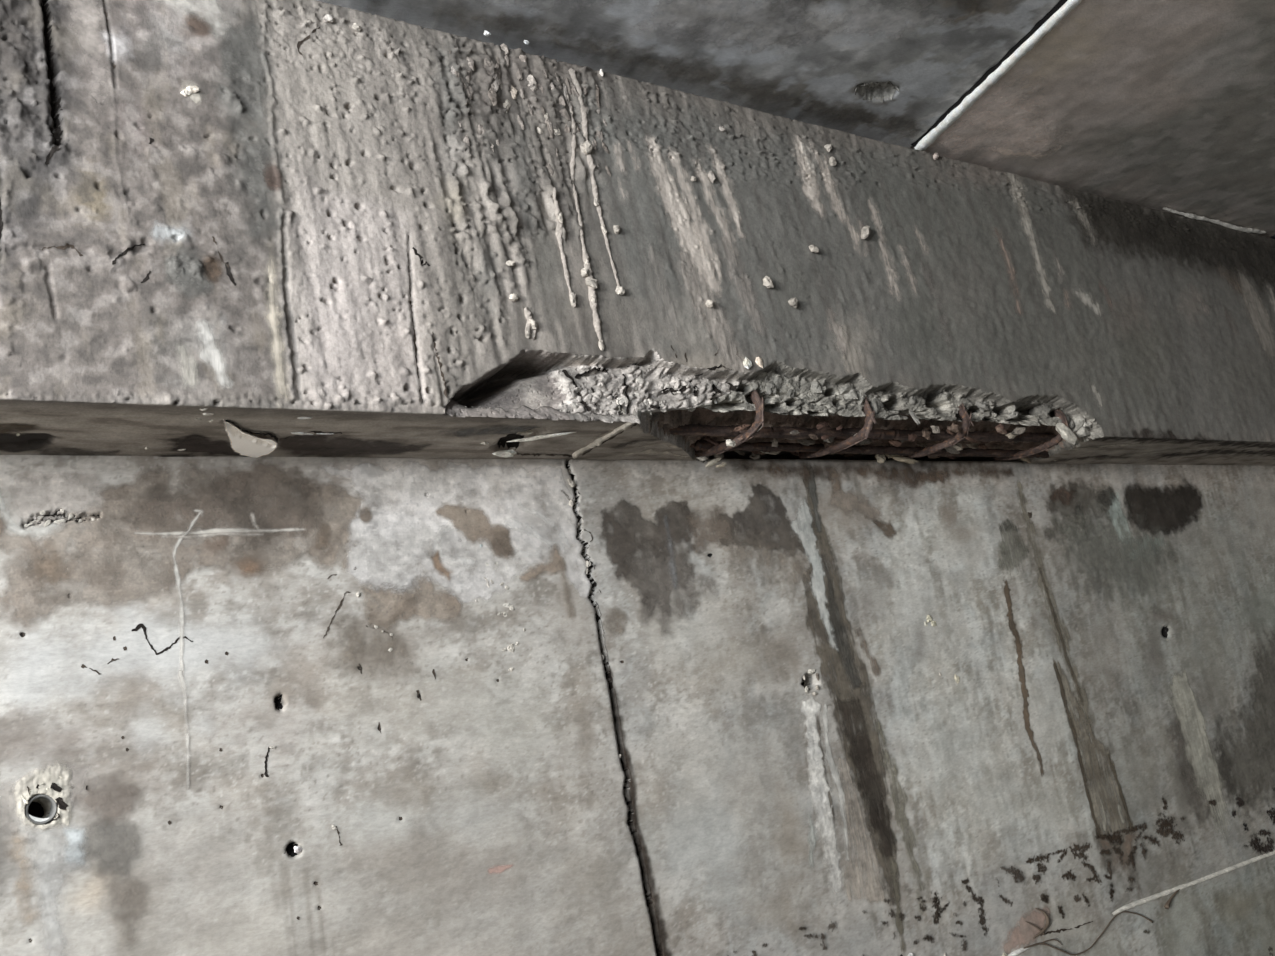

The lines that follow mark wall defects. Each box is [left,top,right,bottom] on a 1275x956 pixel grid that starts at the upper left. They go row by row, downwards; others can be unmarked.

efflorescence [614,137,761,372]
efflorescence [795,136,936,296]
spalling [0,763,89,833]
hole [22,508,100,528]
leakage [0,434,591,662]
crack [516,423,663,956]
leakage [601,466,989,951]
spalling [443,349,1275,468]
corrosion [670,390,1134,887]
leakage [1044,482,1202,590]
leakage [997,640,1275,919]
crack [1040,921,1093,936]